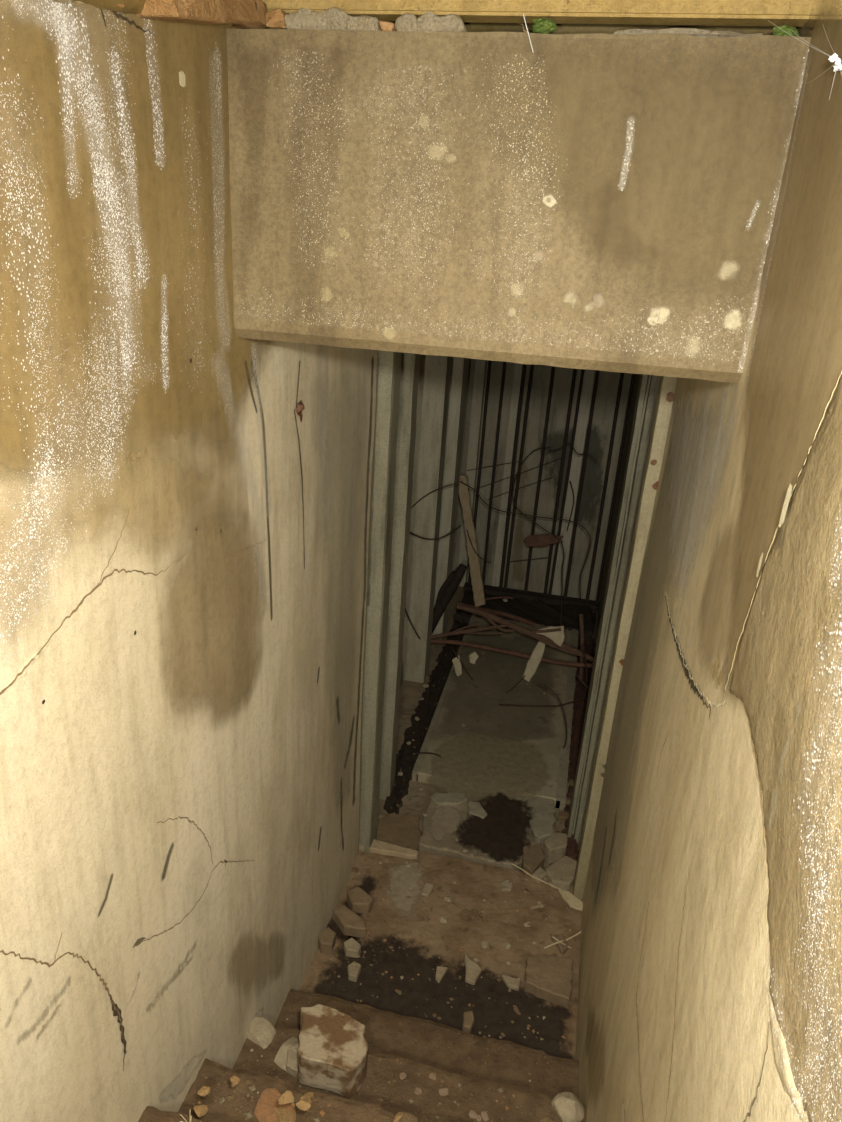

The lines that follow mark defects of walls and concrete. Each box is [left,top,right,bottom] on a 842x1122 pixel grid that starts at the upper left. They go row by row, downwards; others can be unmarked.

crack [0,511,193,695]
crack [222,360,272,620]
crack [294,361,305,569]
water stain [336,358,378,850]
water stain [0,0,842,719]
crack [665,593,766,847]
crack [0,934,127,1071]
crack [133,816,253,948]